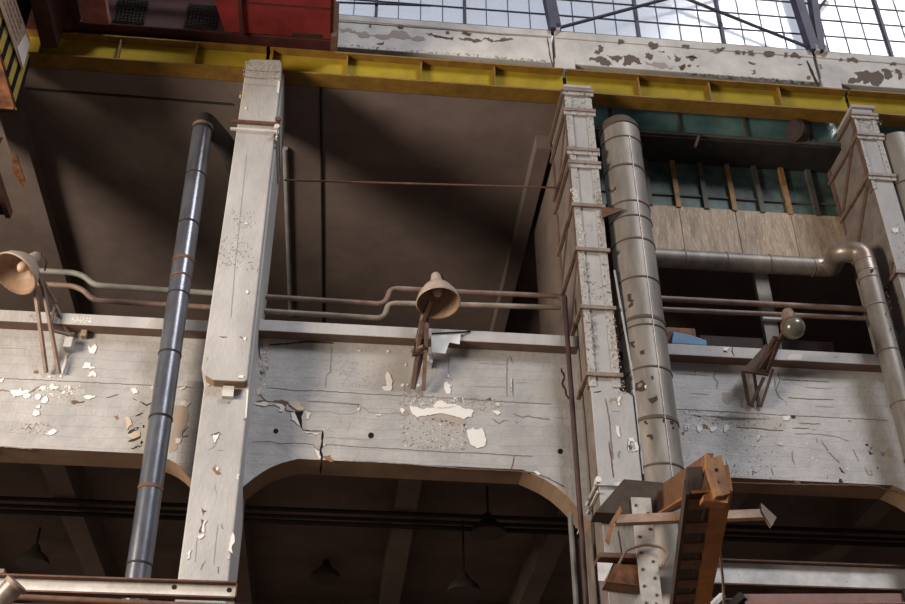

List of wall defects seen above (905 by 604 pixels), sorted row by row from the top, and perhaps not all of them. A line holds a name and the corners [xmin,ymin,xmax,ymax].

peeling [339,25,545,62]
peeling [589,42,811,85]
peeling [839,57,902,86]
crack [231,154,247,312]
peeling [82,344,97,377]
crack [219,336,389,474]
peeling [337,348,501,450]